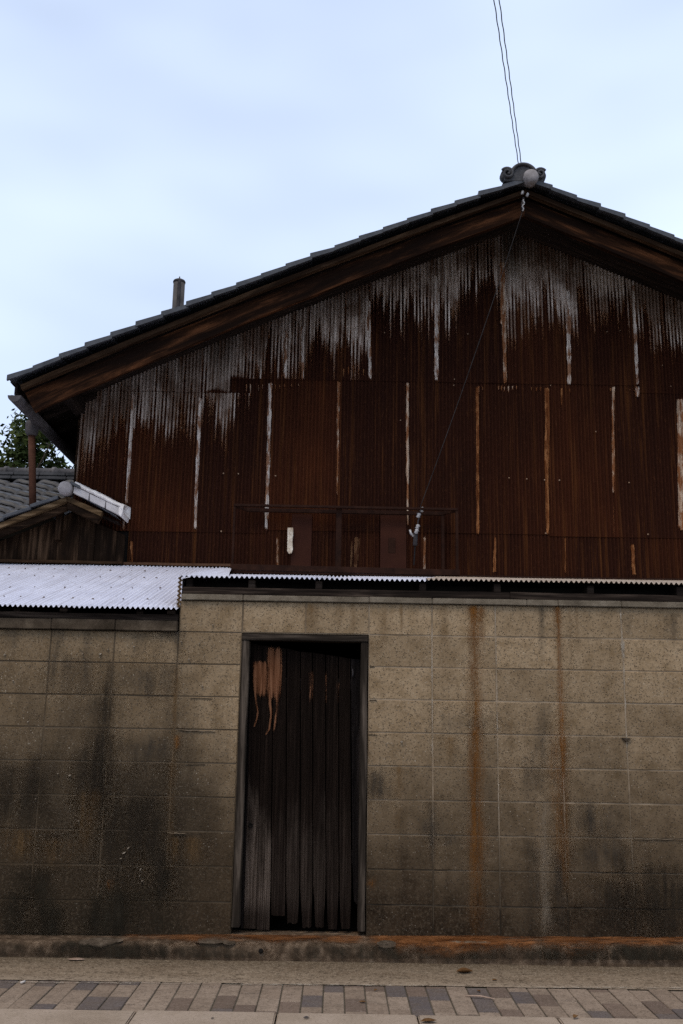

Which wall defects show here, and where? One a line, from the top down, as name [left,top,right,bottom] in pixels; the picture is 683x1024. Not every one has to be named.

peeling [254,677,279,735]
rust [373,935,683,951]